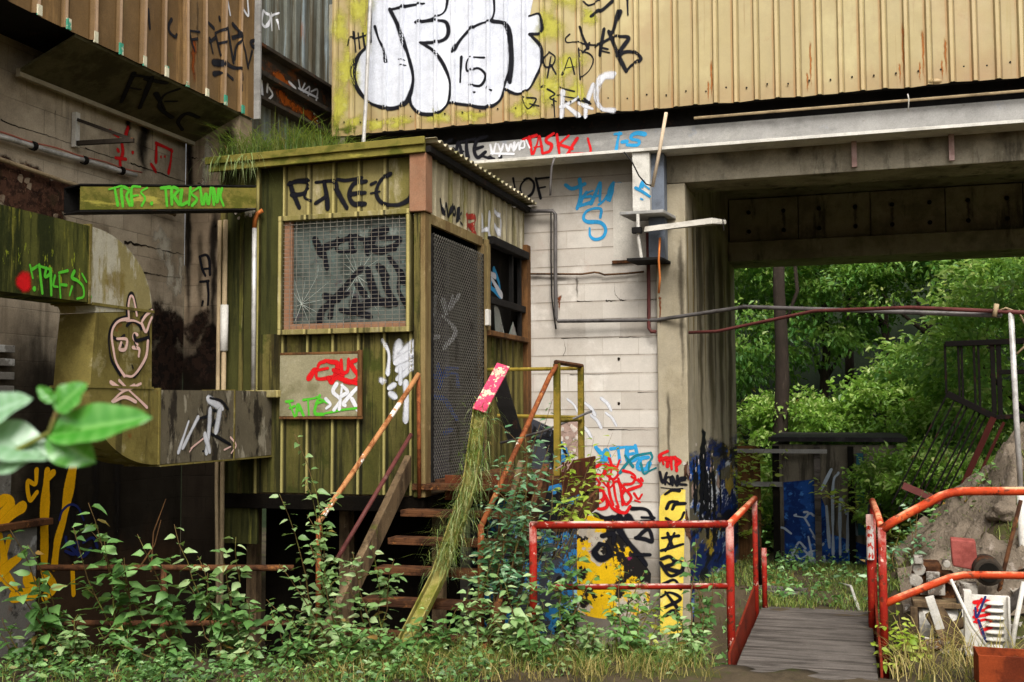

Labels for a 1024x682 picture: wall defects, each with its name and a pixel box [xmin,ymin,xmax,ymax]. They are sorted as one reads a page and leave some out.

leakage [126,120,149,169]
leakage [186,130,235,185]
leakage [152,214,218,390]